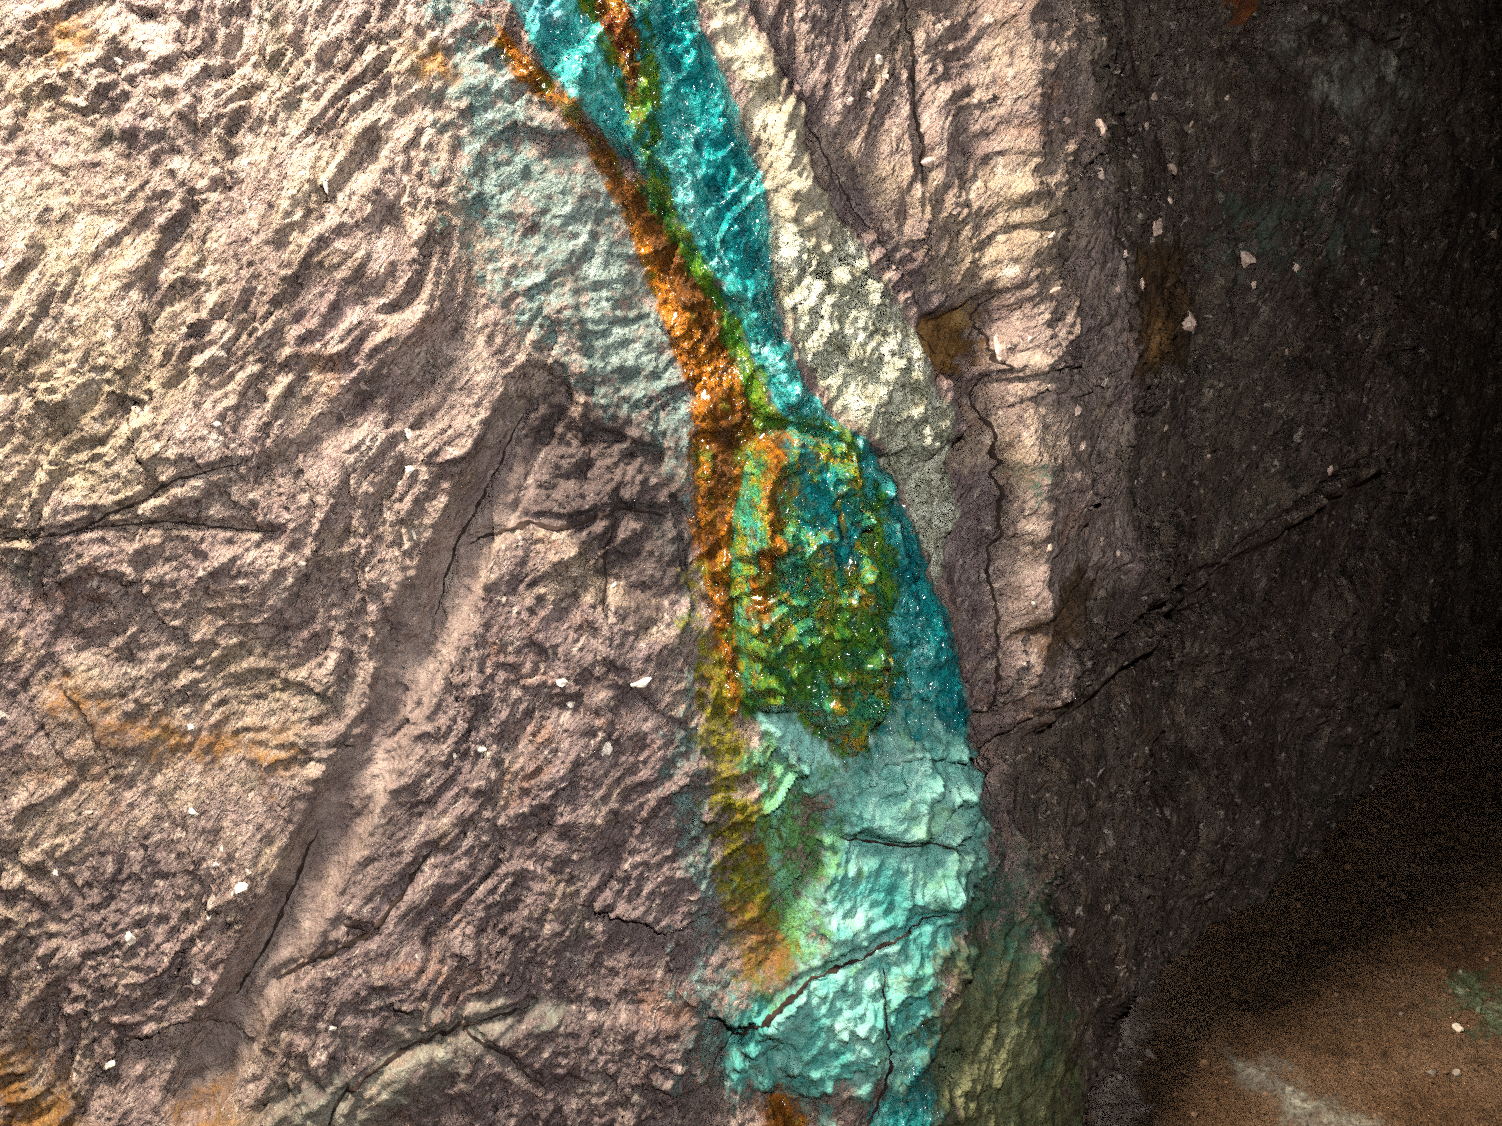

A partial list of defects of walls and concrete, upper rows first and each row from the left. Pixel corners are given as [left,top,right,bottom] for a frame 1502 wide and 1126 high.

rust [492,0,783,720]
rust [916,302,986,374]
crack [1114,201,1136,413]
crack [0,463,276,542]
leakage [417,0,1092,1126]
crack [968,295,1050,798]
crack [1077,451,1373,680]
crack [839,836,966,851]
rust [755,1083,809,1126]